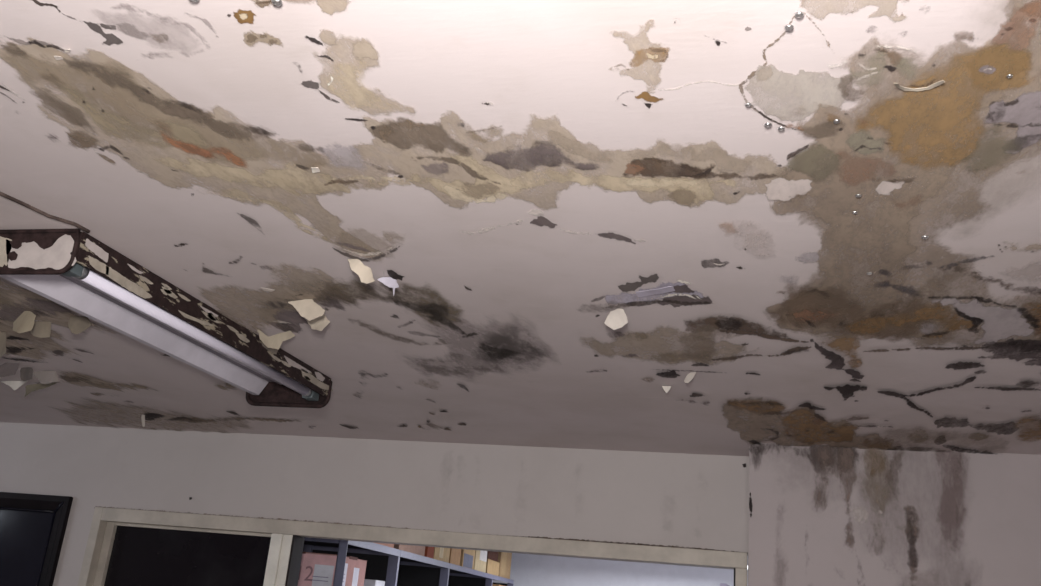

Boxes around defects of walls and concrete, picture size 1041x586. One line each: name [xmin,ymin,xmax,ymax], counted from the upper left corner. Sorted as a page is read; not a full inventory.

crack [317,0,347,15]
peeling [300,30,415,115]
crack [668,0,805,130]
peeling [517,210,557,228]
peeling [598,233,642,244]
peeling [0,280,147,397]
peeling [202,264,343,349]
water stain [309,282,547,375]
peeling [592,274,712,330]
water stain [584,328,748,405]
water stain [722,393,943,546]
water stain [904,506,918,580]